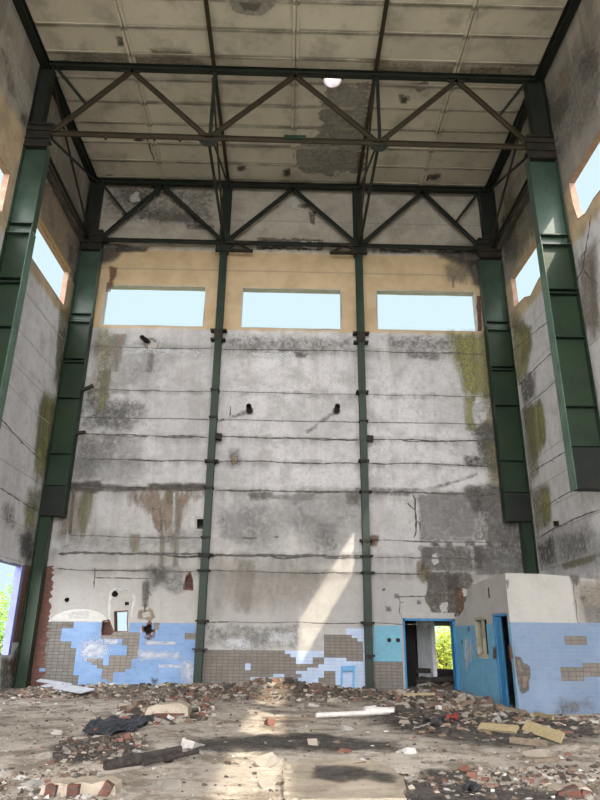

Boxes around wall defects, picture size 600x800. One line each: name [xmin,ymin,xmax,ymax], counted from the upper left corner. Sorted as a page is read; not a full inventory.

spalling [229,0,276,15]
peeling [283,82,371,176]
leakage [106,187,212,230]
leakage [373,249,480,287]
leakage [82,335,144,428]
leakage [372,336,523,583]
peeling [29,566,79,686]
peeling [86,608,156,682]
leakage [59,484,199,606]
peeling [184,623,363,687]
crack [57,486,504,611]
flaking render [417,572,473,617]